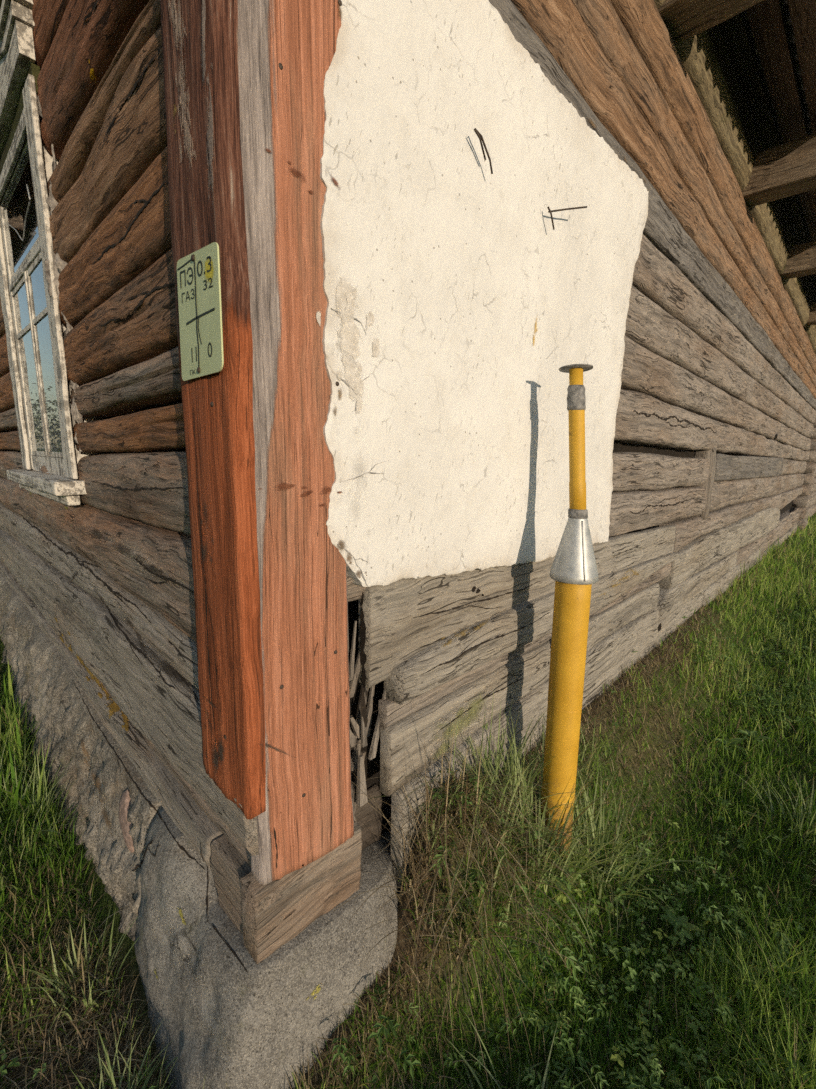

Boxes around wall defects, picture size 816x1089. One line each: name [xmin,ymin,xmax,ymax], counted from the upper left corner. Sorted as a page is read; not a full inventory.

flaking render [329,276,380,413]
crack [72,679,248,973]